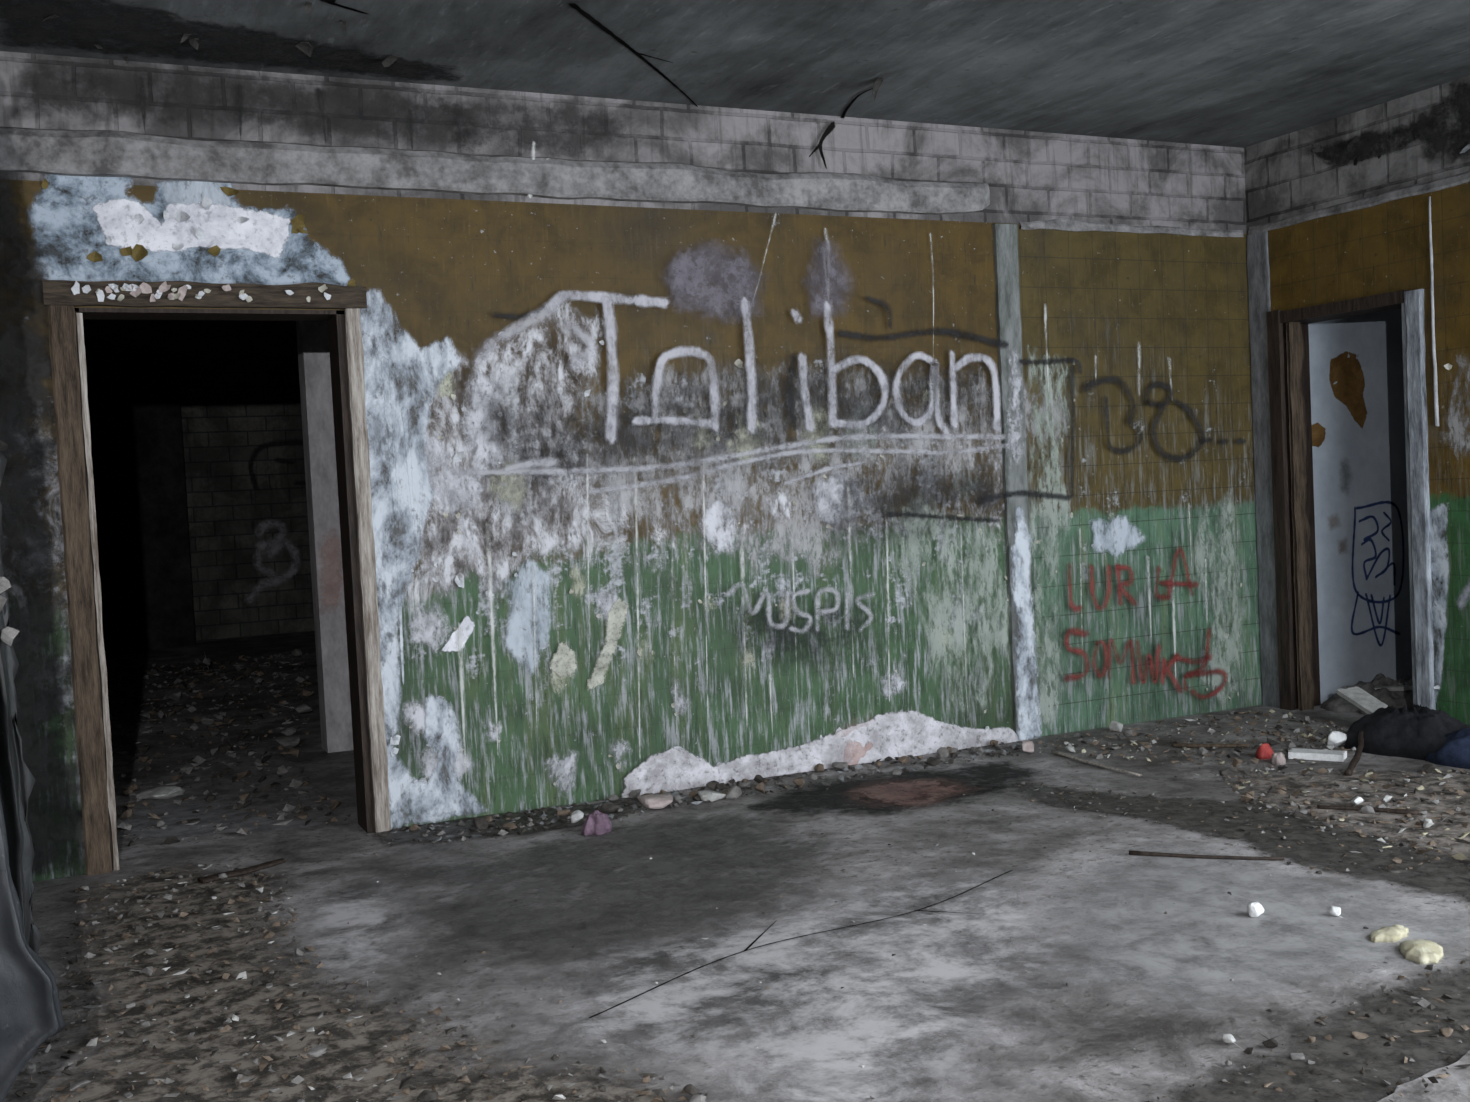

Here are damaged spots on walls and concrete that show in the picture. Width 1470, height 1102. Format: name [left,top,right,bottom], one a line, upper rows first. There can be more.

crack [568,3,698,107]
peeling [28,174,1075,829]
peeling [1091,516,1144,556]
peeling [0,577,19,647]